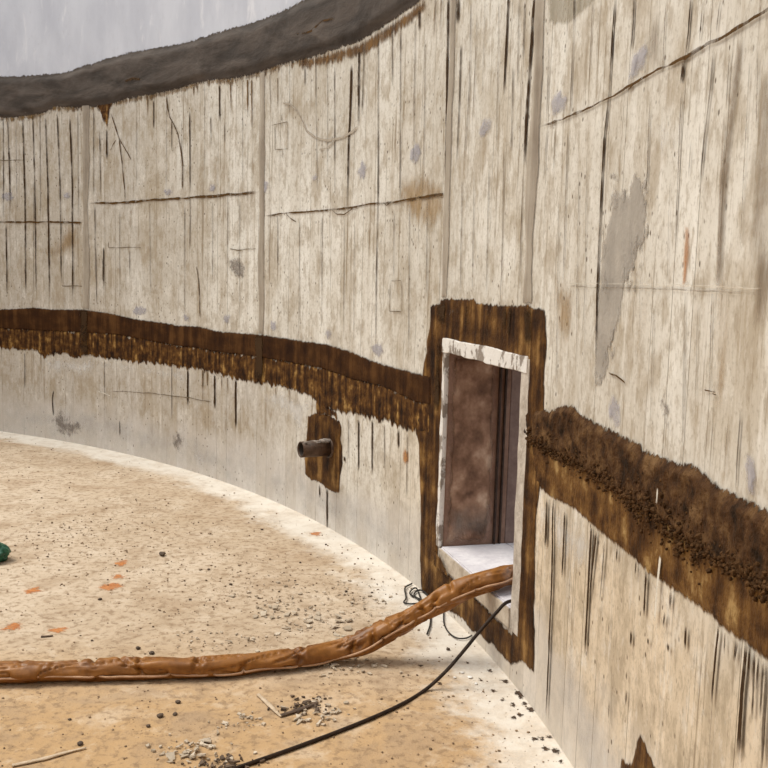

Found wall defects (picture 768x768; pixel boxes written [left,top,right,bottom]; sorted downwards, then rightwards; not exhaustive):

crack [547,8,768,125]
crack [0,218,81,226]
crack [95,98,253,205]
crack [268,193,443,222]
peeling [595,174,648,385]
corrosion [0,298,768,671]
damp [544,502,567,706]
damp [578,528,604,649]
damp [635,557,665,625]
damp [711,628,768,758]